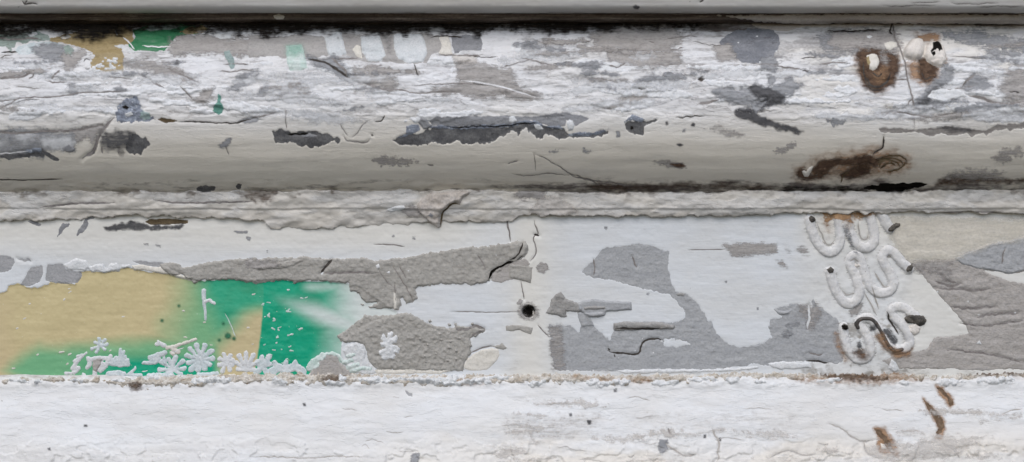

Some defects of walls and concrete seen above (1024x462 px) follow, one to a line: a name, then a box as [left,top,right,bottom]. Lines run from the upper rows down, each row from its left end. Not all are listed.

peeling [0,24,1024,155]
corrosion [856,47,947,93]
spalling [42,145,75,161]
crack [515,154,644,186]
corrosion [797,136,911,182]
peeling [0,255,15,272]
crack [455,220,548,336]
peeling [0,258,546,398]
corrosion [869,325,910,358]
peeling [586,361,811,400]
corrosion [923,386,954,439]
corrosion [874,427,899,457]